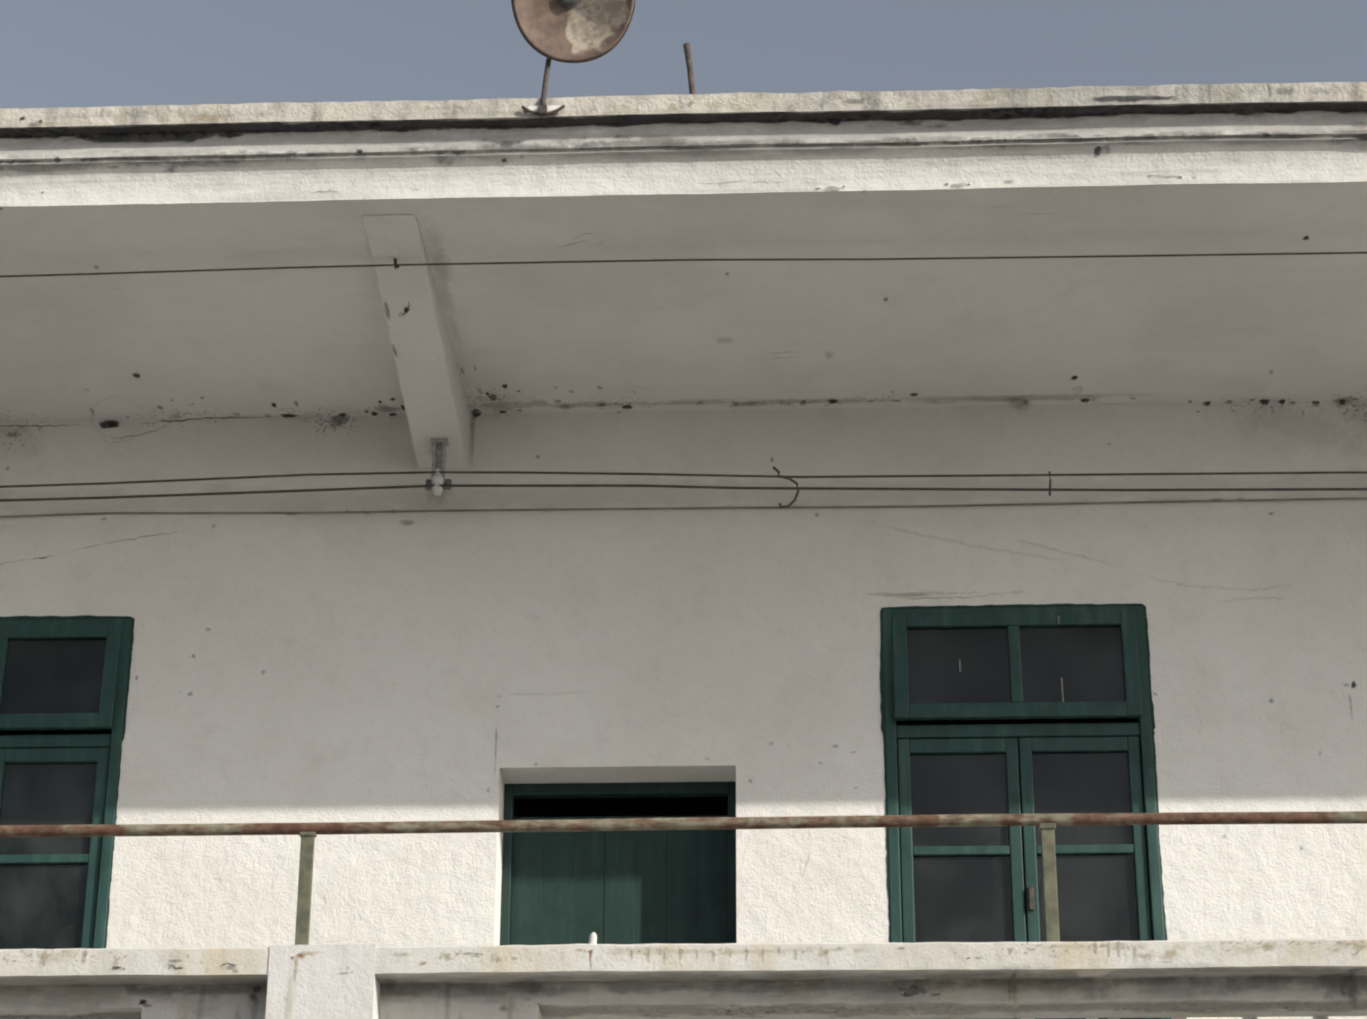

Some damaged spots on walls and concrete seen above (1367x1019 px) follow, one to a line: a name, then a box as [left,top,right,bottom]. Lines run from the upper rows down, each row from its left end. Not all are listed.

water stain [0,95,1367,143]
water stain [472,384,508,417]